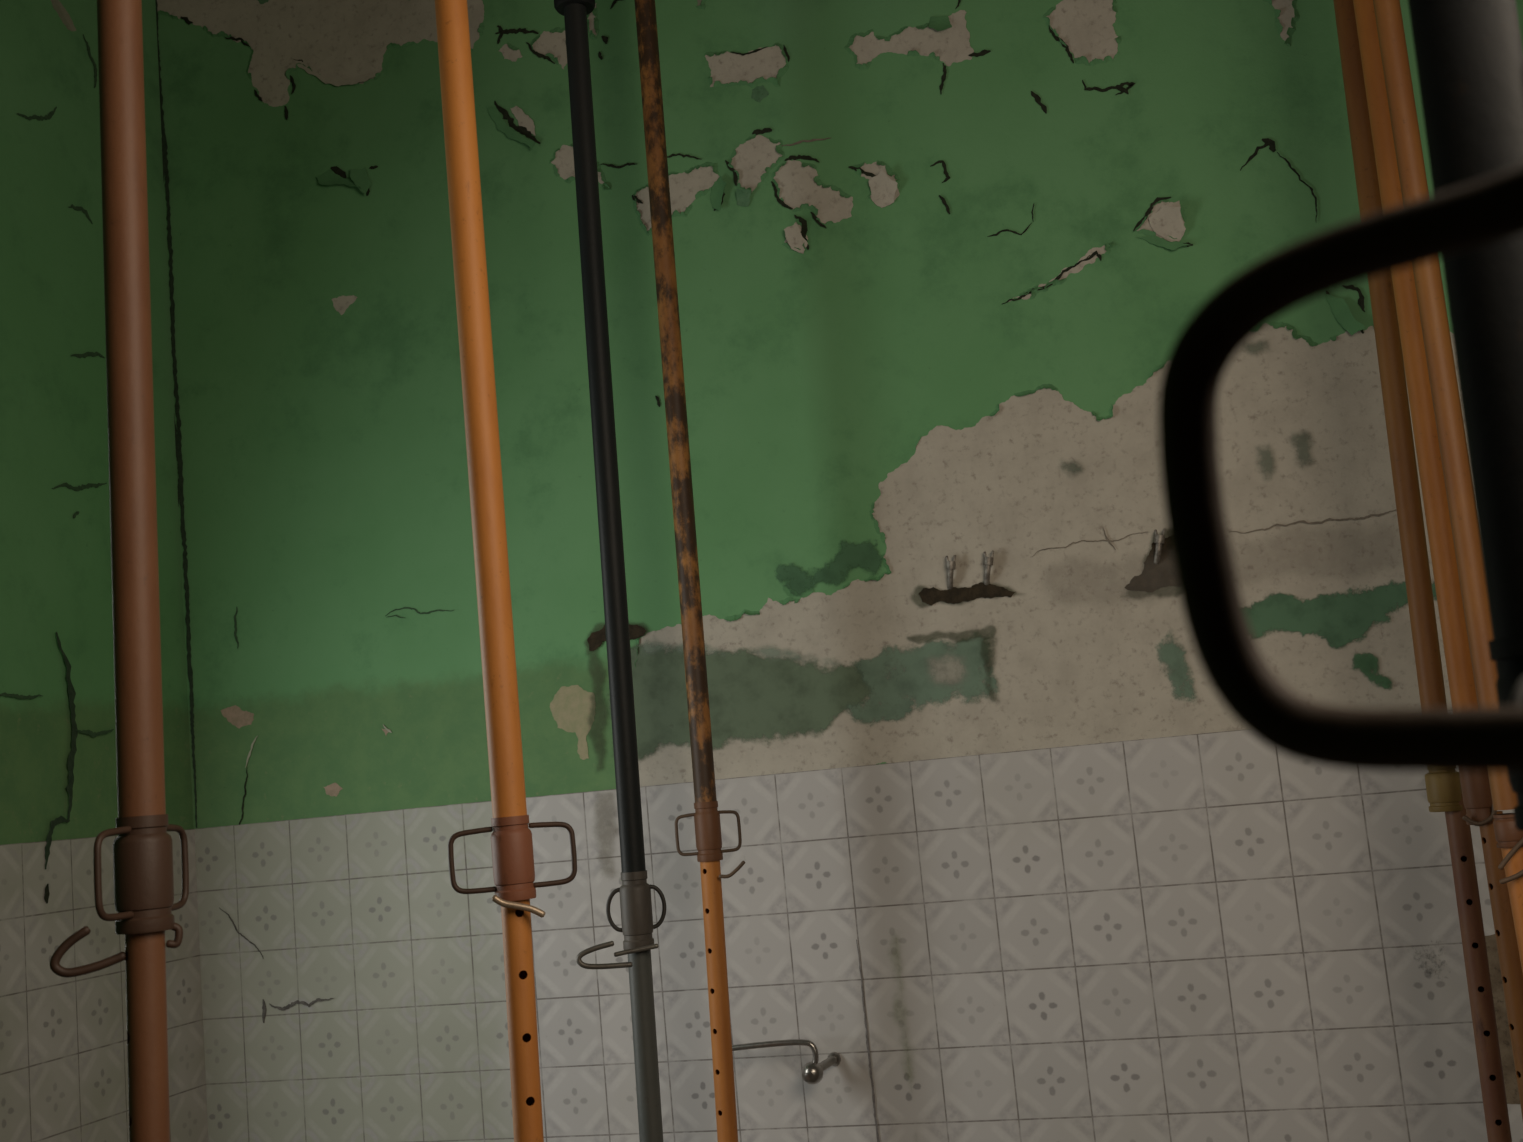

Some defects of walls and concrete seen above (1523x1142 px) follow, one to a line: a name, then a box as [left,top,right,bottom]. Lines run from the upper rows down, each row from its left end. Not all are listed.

peeling [155,0,438,120]
peeling [844,0,991,94]
peeling [1043,0,1122,66]
peeling [667,128,900,254]
crack [1240,138,1317,218]
crack [1002,250,1102,304]
peeling [703,364,1246,780]
peeling [1217,321,1421,709]
crack [0,632,114,903]
peeling [550,685,595,760]
peeling [638,742,693,787]
crack [856,939,880,1142]